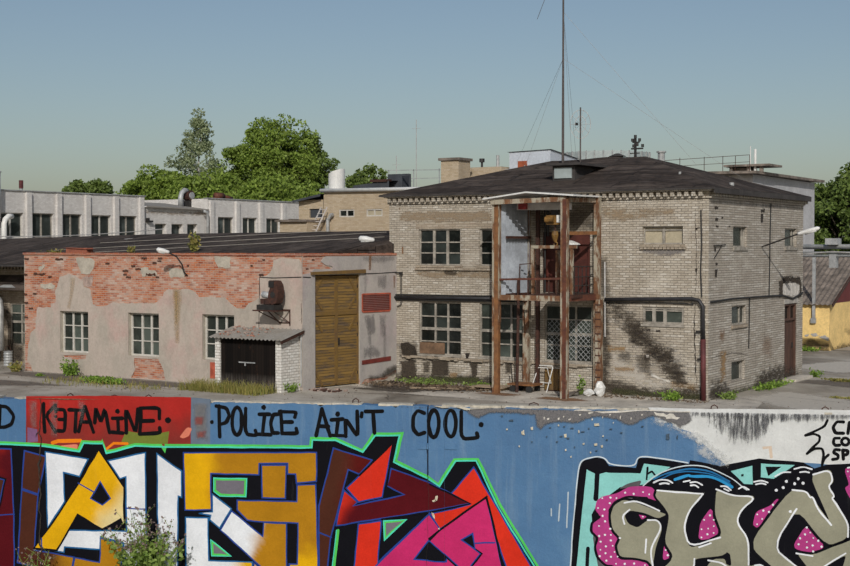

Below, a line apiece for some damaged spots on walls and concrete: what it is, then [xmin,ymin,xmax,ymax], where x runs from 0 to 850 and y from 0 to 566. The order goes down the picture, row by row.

peeling [24,255,331,371]
peeling [132,358,166,380]
damp [603,303,850,400]
spalling [436,406,729,465]
damp [694,412,845,443]